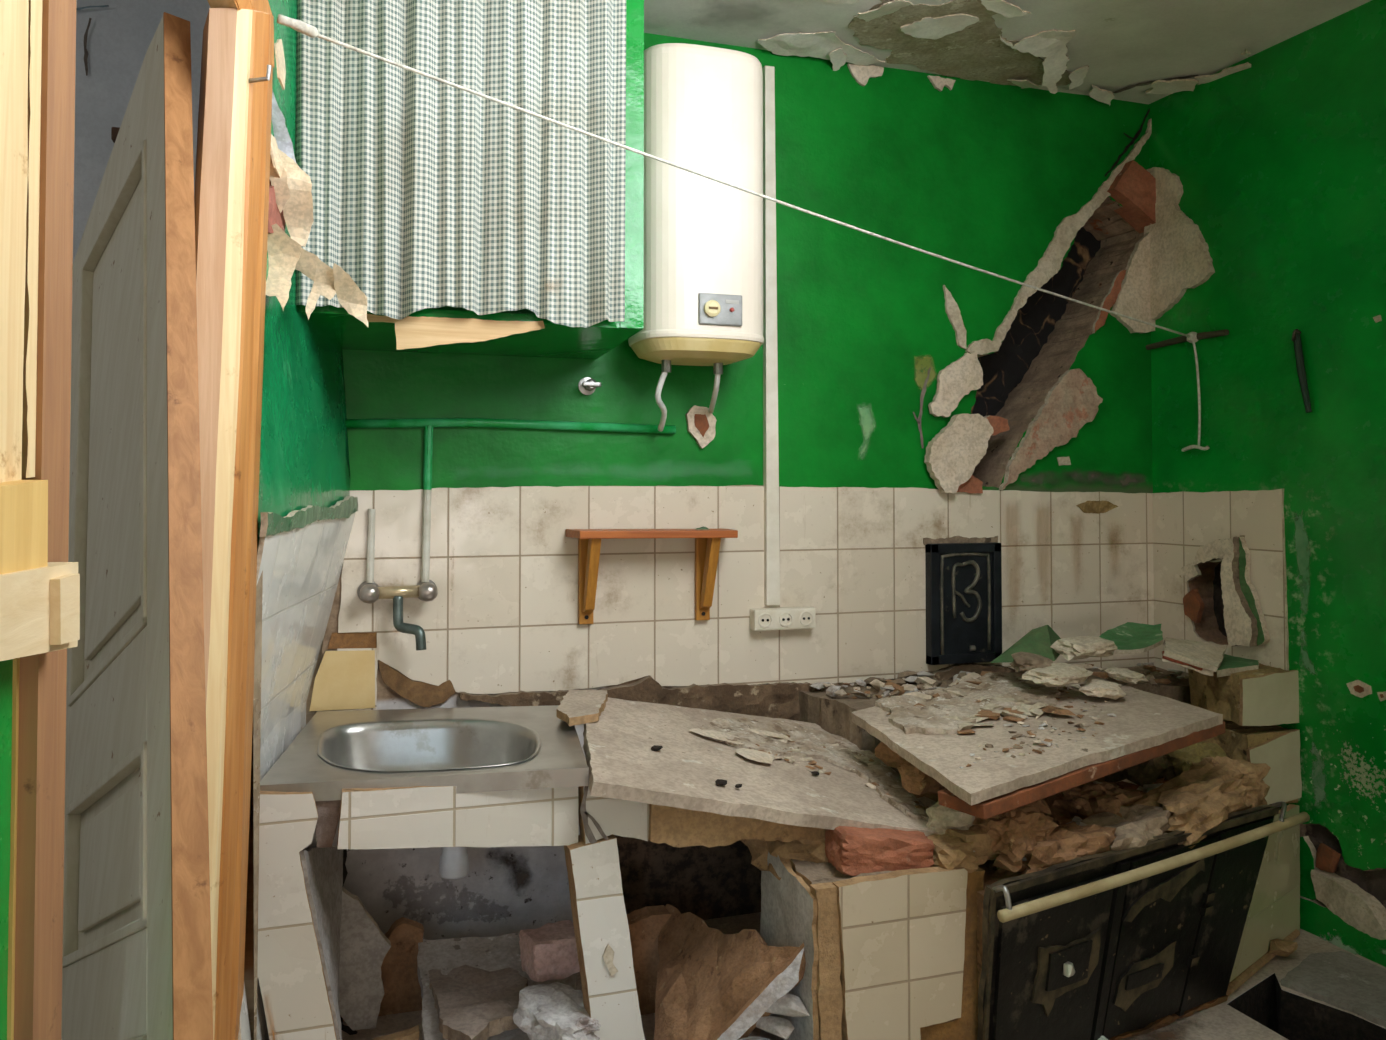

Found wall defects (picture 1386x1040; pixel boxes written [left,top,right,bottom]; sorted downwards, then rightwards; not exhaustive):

crack [76,5,109,76]
peeling [758,0,1251,106]
peeling [266,39,368,327]
flaking render [924,118,1215,494]
flaking render [685,405,717,448]
flaking render [1181,535,1270,647]
flaking render [1347,680,1386,701]
peeling [1311,742,1386,806]
damp [489,850,531,890]
flaking render [1300,824,1386,955]